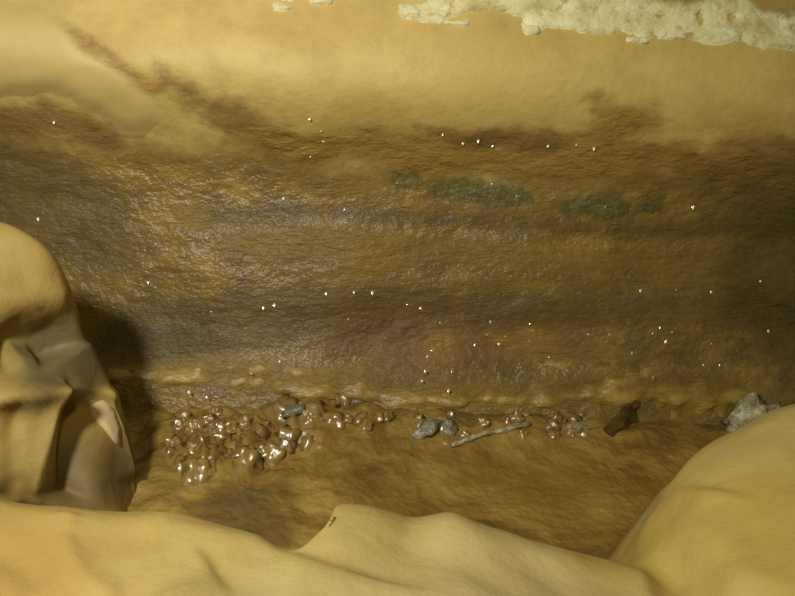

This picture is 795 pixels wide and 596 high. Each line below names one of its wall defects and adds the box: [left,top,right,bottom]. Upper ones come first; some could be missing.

peeling [272,0,295,11]
peeling [398,0,795,51]
water stain [0,125,795,425]